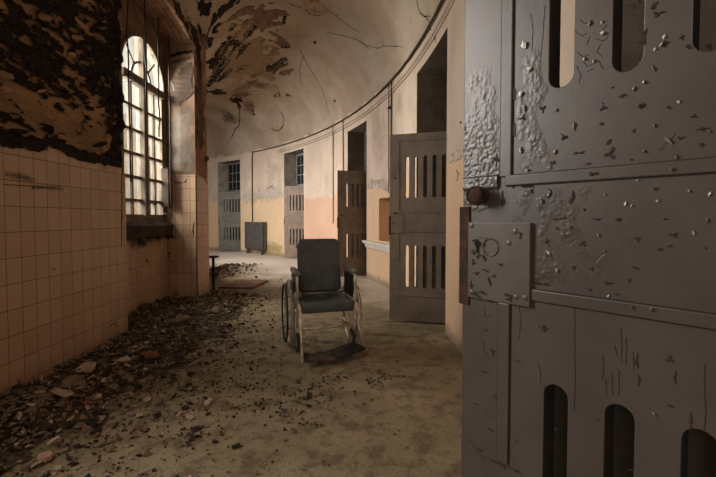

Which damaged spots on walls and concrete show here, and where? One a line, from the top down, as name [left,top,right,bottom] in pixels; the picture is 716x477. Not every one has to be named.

peeling [0,0,126,168]
peeling [170,0,294,115]
crack [290,4,401,49]